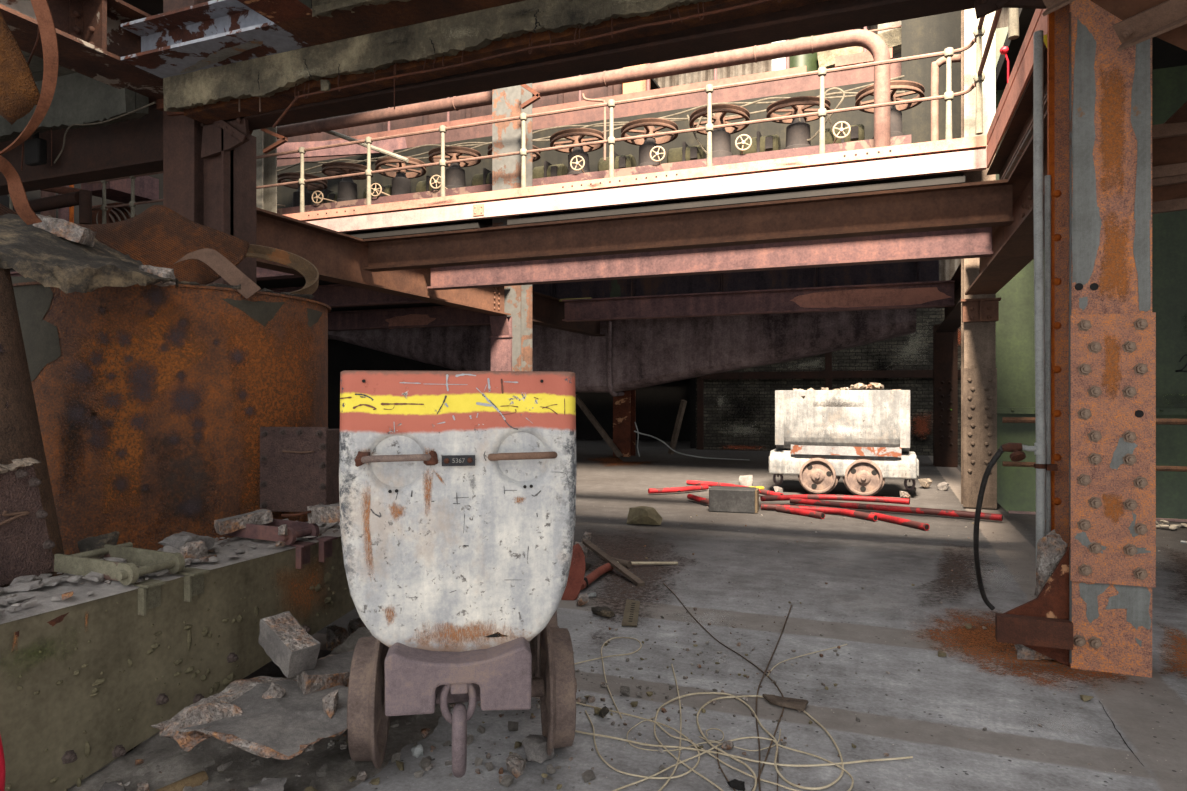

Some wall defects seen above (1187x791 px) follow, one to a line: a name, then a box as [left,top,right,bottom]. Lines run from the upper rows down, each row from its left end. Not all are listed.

corrosion [1099,69,1125,192]
corrosion [1099,213,1130,301]
corrosion [918,546,1134,688]
peeling [1079,582,1151,647]